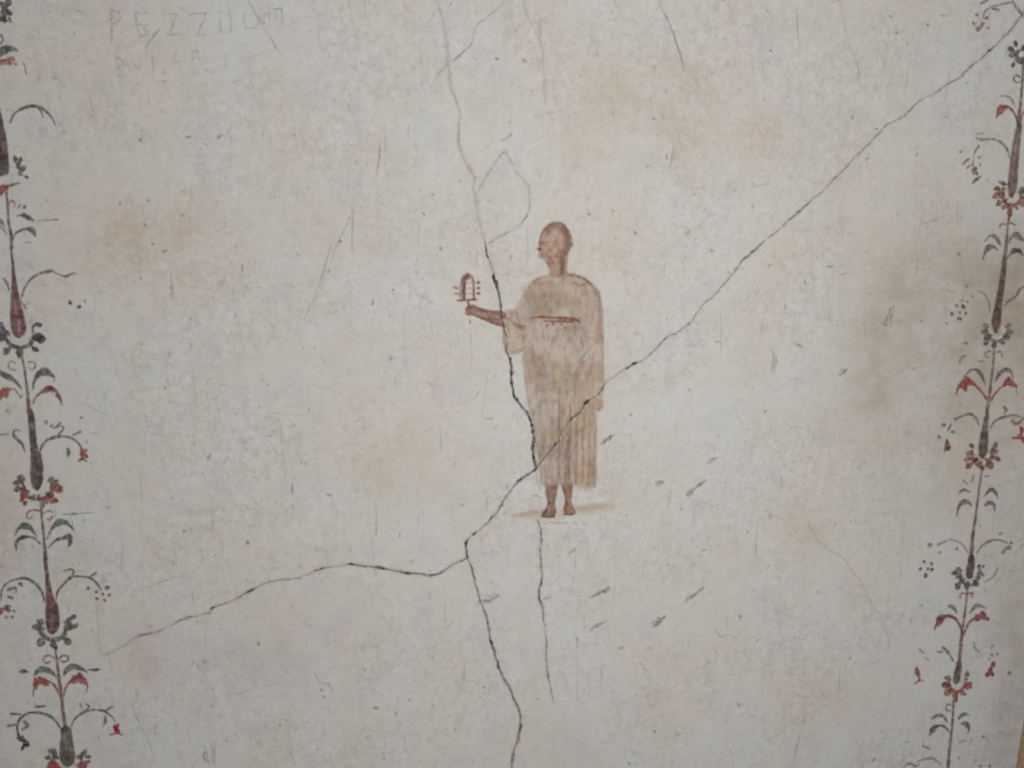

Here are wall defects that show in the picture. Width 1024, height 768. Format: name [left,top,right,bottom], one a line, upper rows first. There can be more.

crack [415,0,1024,556]
crack [94,553,525,768]
crack [534,518,557,706]